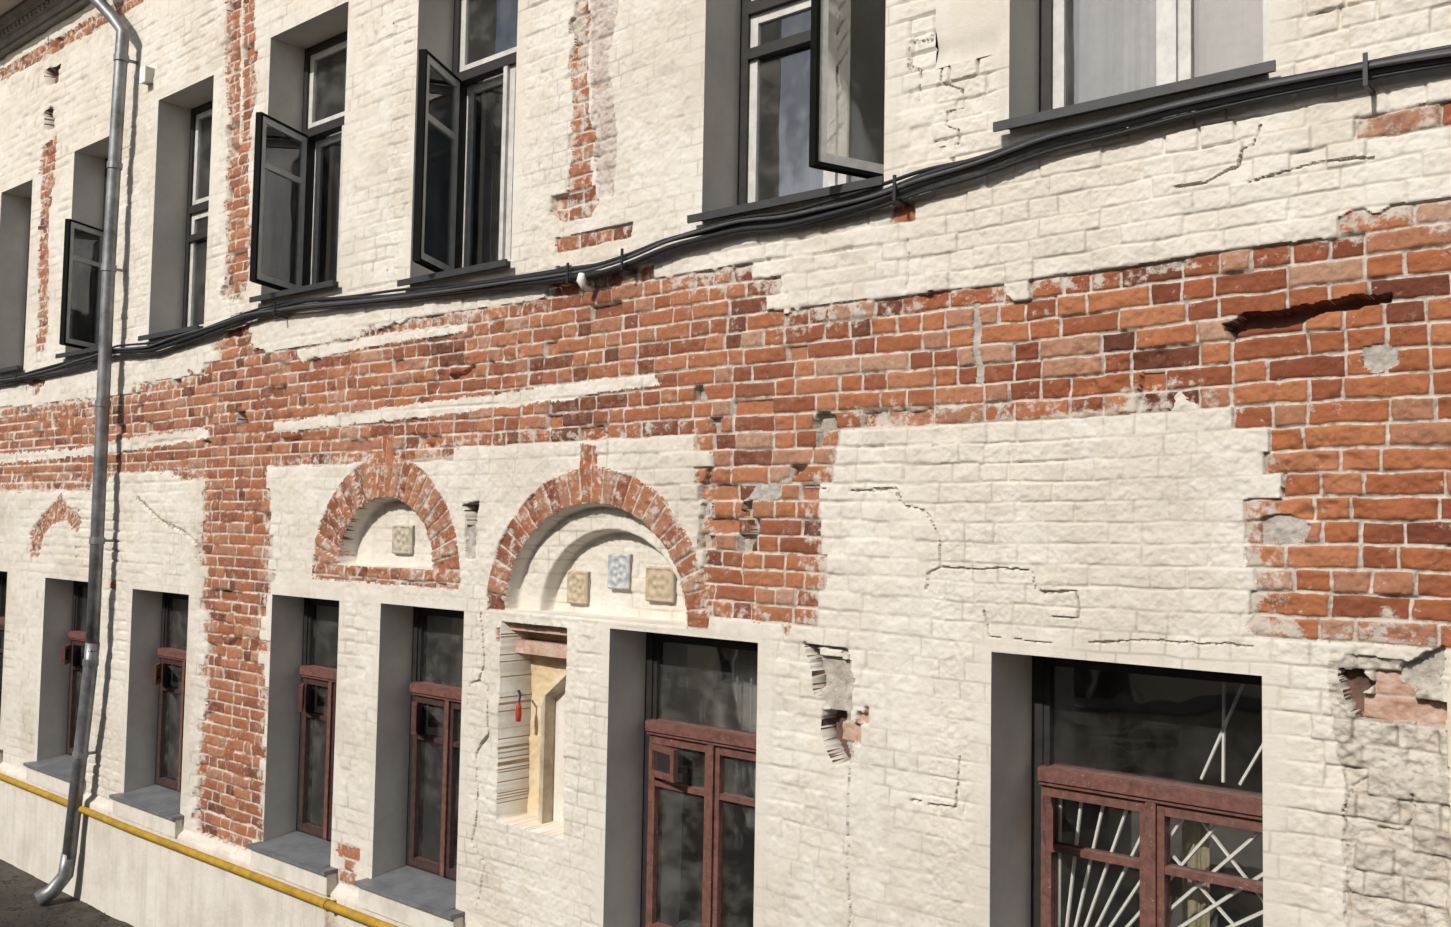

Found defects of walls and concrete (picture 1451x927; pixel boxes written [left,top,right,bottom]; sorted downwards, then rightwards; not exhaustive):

peeling [36,107,58,352]
peeling [0,0,144,84]
peeling [221,0,258,302]
peeling [549,0,633,253]
peeling [1353,100,1451,141]
peeling [0,377,96,558]
crack [694,385,723,434]
peeling [107,197,1451,927]
crack [697,411,1254,647]
crack [467,613,490,899]
crack [845,768,853,926]